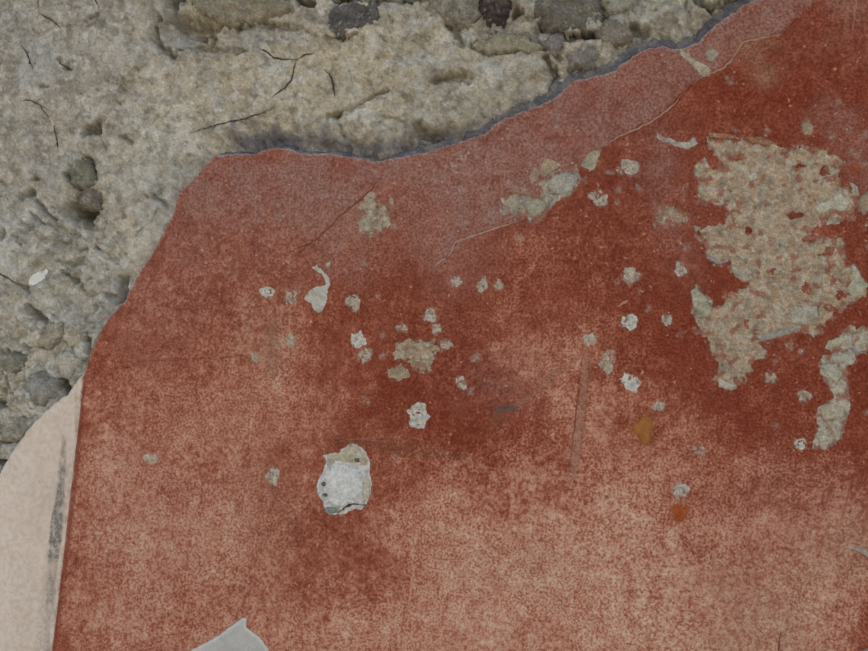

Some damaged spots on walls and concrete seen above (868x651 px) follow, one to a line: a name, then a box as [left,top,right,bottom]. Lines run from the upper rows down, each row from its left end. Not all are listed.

crack [192,48,335,133]
crack [598,23,791,153]
crack [286,174,384,255]
crack [432,219,526,274]
flaking render [497,149,601,224]
flaking render [286,262,331,313]
flaking render [345,294,360,310]
flaking render [653,119,868,450]
flaking render [351,330,372,363]
flaking render [388,308,453,380]
flaking render [407,402,431,429]
flaking render [317,443,372,515]